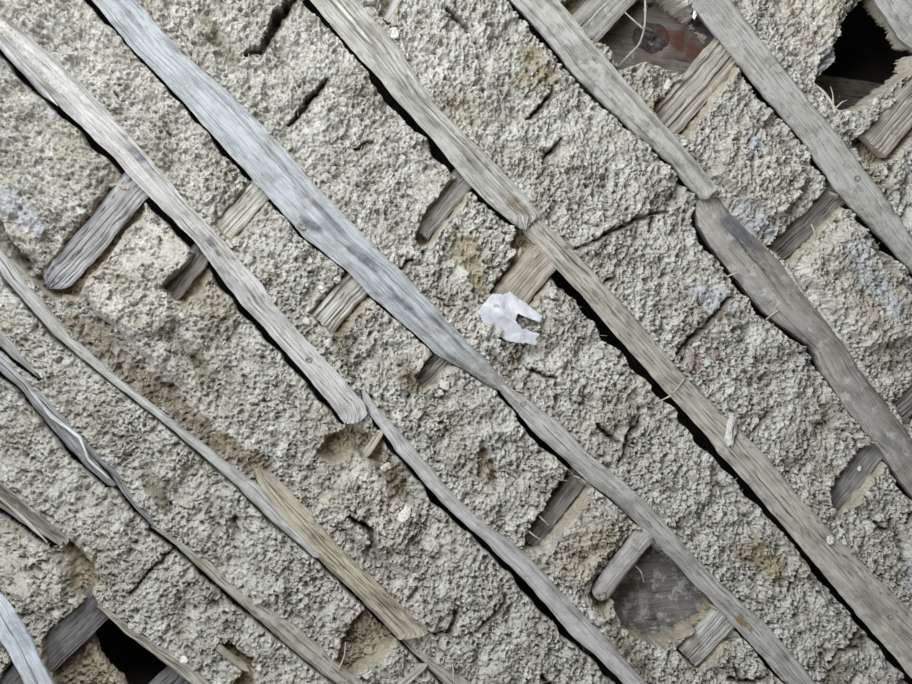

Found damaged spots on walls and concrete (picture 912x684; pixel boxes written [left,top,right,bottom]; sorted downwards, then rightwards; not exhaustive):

spalling [559,0,585,15]
spalling [591,18,685,116]
spalling [632,0,707,44]
spalling [673,66,741,146]
spalling [811,0,912,176]
spalling [34,532,161,684]
spalling [584,521,740,680]